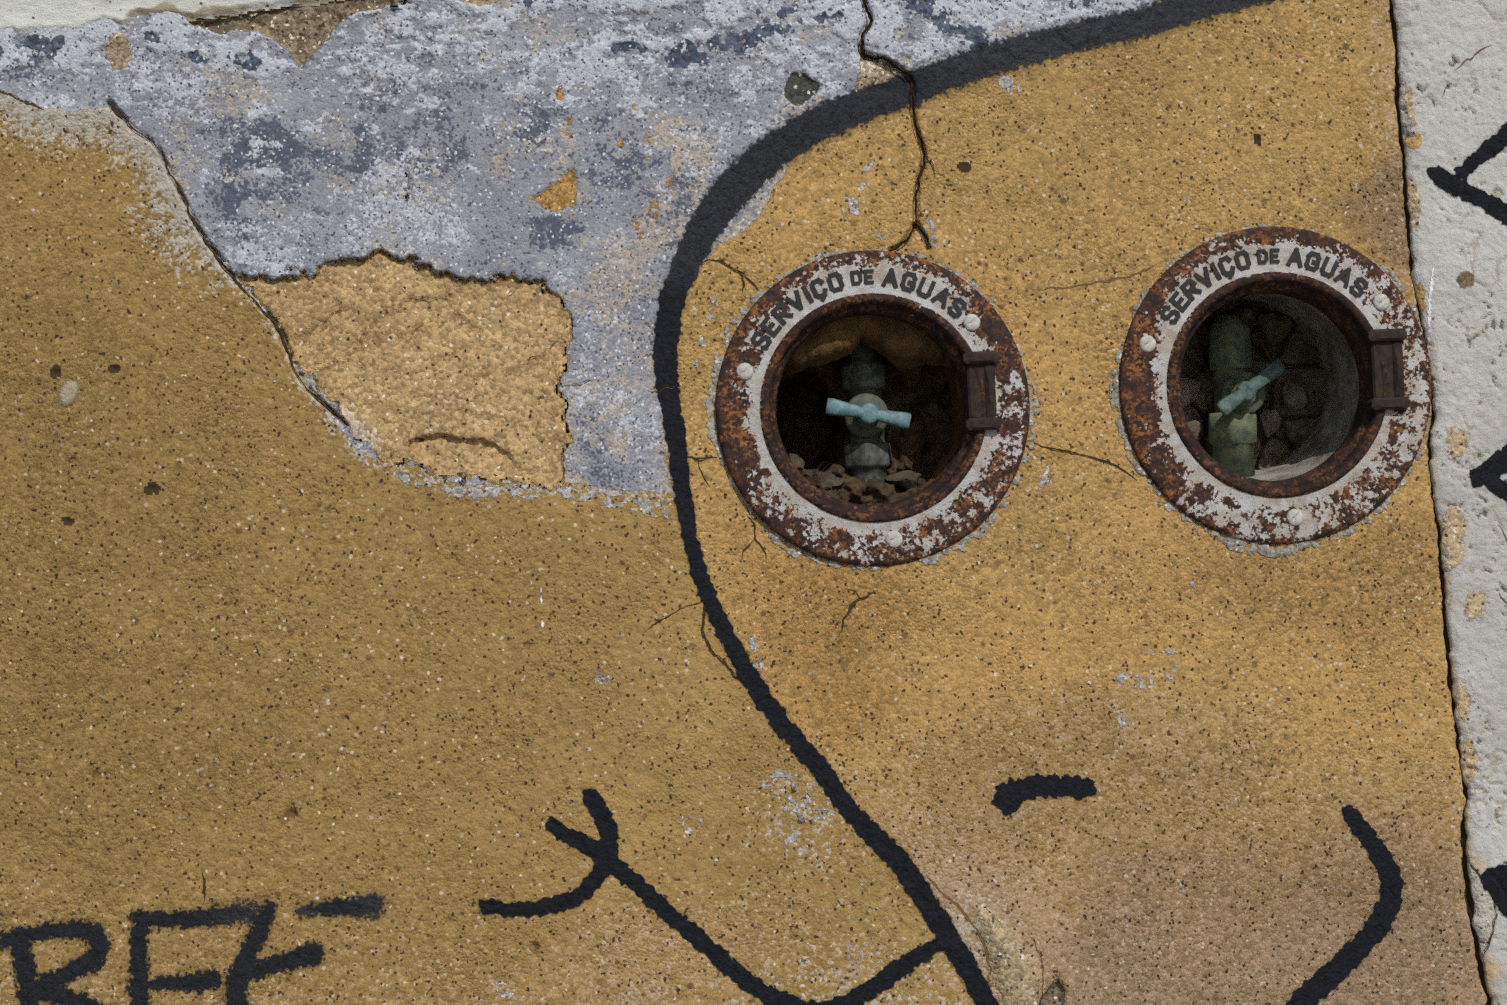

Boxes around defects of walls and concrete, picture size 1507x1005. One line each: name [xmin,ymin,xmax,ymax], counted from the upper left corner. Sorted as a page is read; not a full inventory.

crack [110,103,473,425]
crack [522,343,597,387]
peeling [0,0,1155,519]
crack [860,0,935,251]
crack [1389,0,1427,346]
crack [1441,45,1491,98]
crack [1427,394,1498,1005]